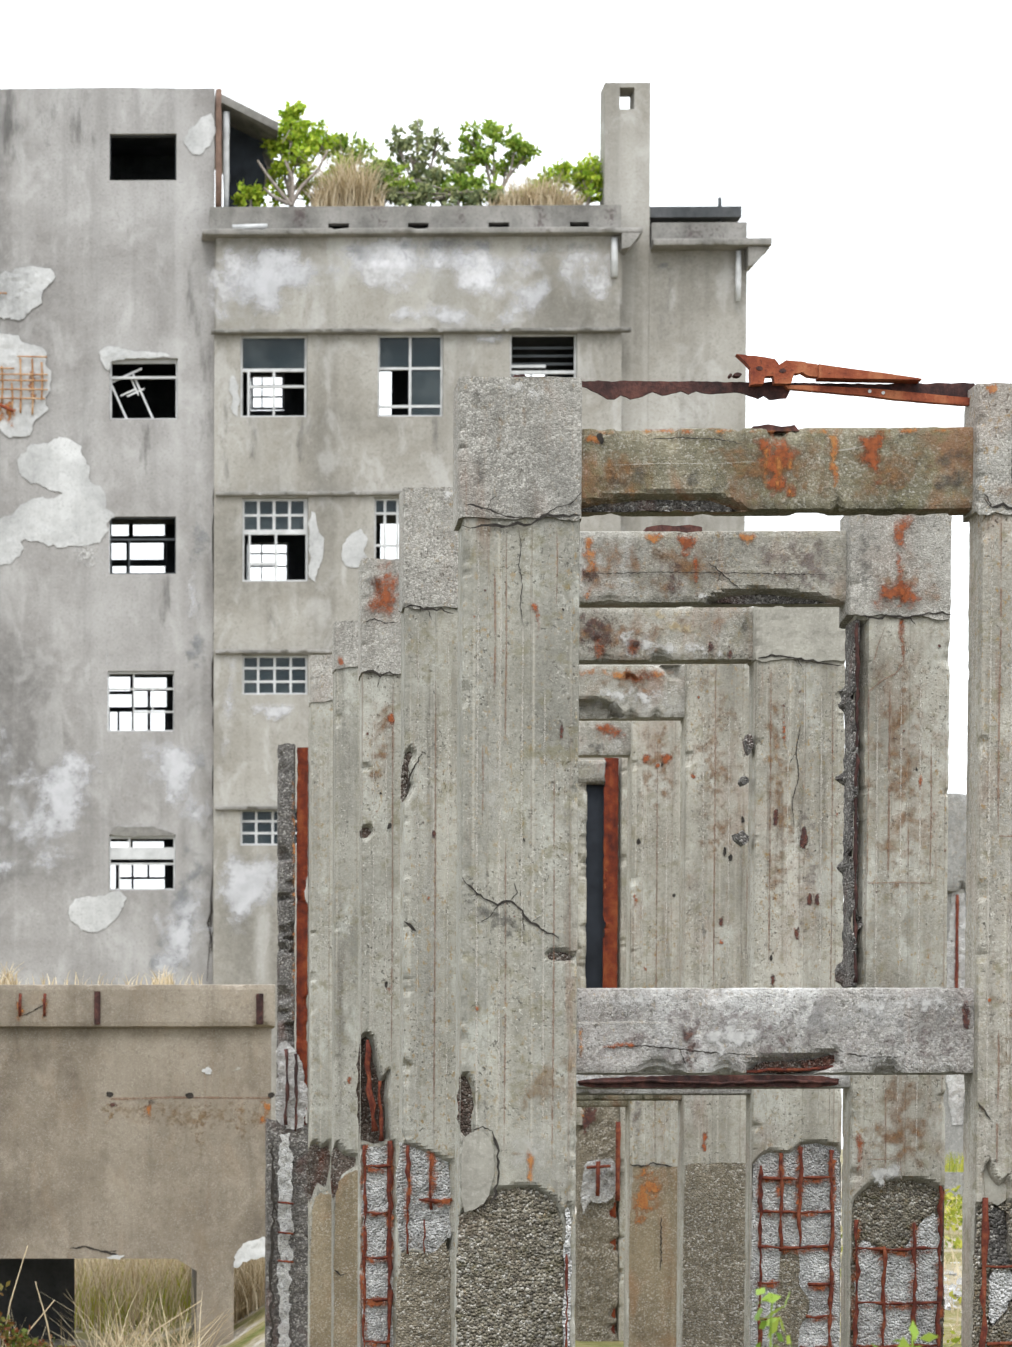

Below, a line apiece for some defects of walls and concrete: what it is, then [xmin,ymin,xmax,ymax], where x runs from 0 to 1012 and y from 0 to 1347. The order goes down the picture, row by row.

efflorescence [214,249,314,310]
damp [347,237,548,322]
peeling [0,266,115,565]
rust [751,424,799,497]
rust [821,429,839,486]
rust [874,516,938,655]
peeling [68,891,127,932]
crack [462,877,559,939]
spalling [234,1037,945,1347]
spalling [971,1169,1012,1347]